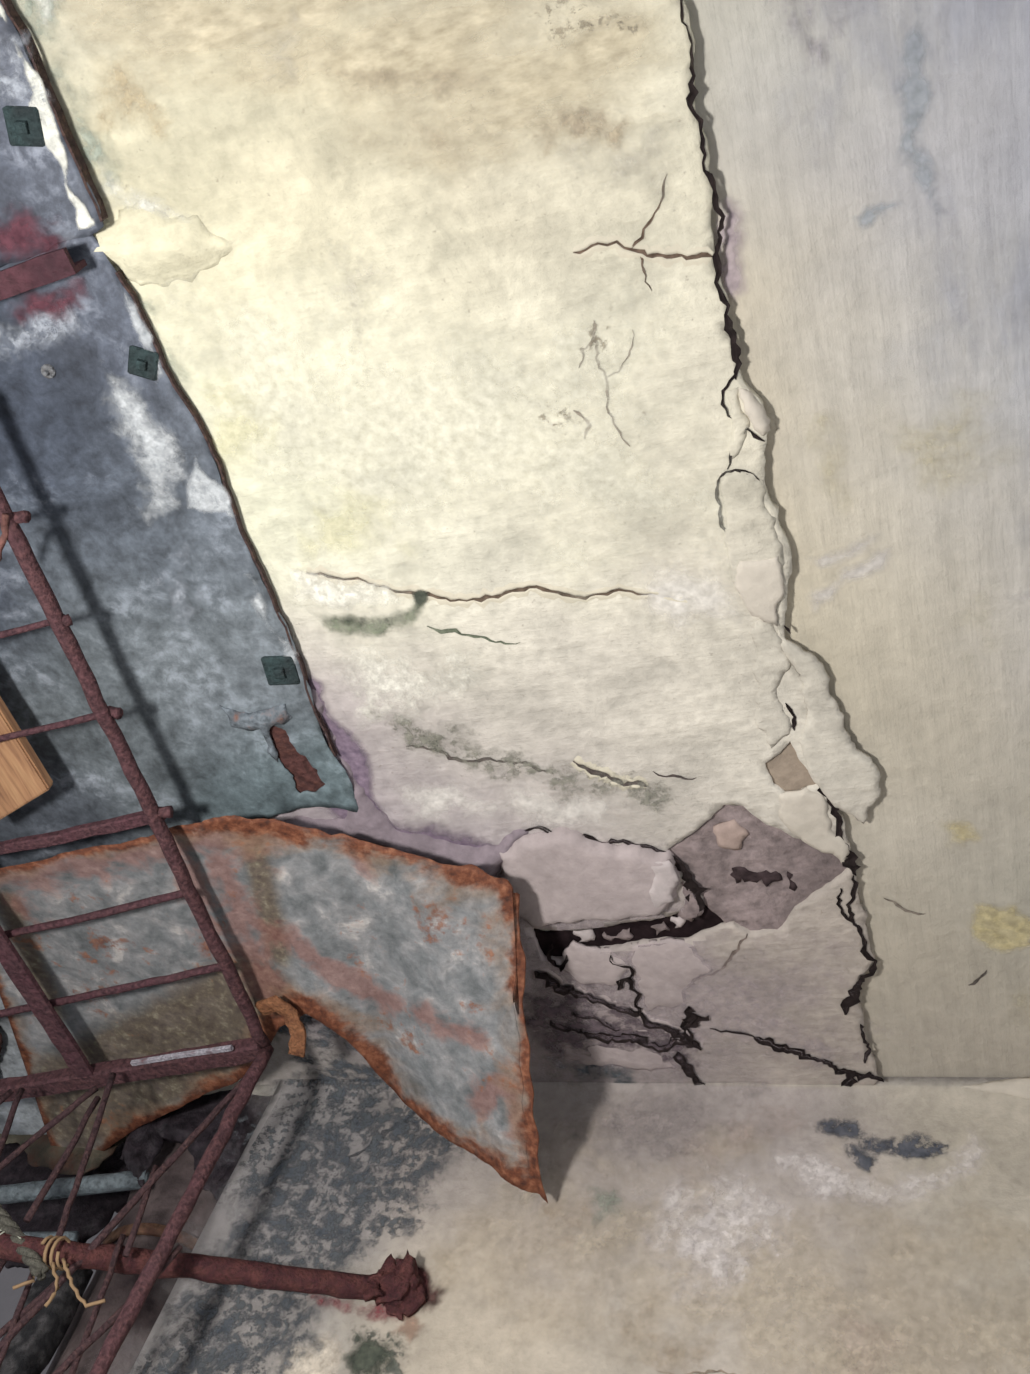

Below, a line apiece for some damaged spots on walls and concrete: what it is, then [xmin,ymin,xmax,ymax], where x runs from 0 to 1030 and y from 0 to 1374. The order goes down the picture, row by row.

crack [573,0,765,531]
crack [306,564,687,645]
crack [785,703,796,731]
crack [524,788,923,1087]
crack [969,970,987,985]